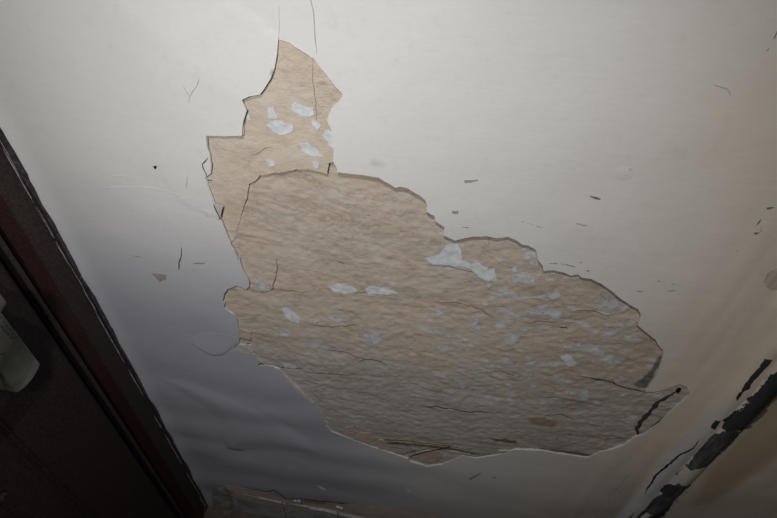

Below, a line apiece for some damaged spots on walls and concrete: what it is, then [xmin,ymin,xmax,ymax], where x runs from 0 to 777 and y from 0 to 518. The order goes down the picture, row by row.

flaking render [202,40,689,465]
peeling [637,359,777,518]